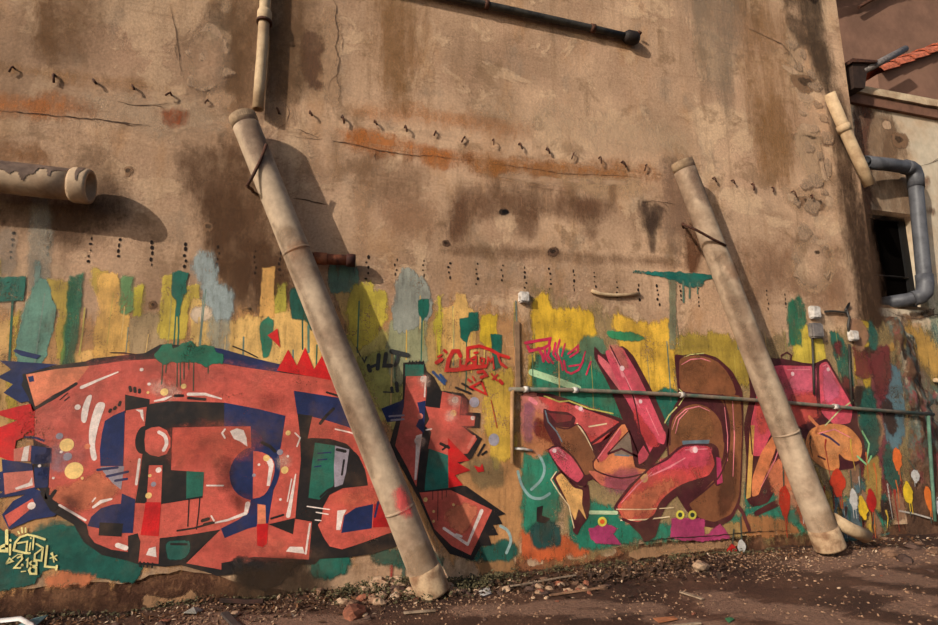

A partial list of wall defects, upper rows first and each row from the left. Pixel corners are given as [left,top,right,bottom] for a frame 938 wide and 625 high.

water stain [301,32,325,90]
crack [328,0,343,101]
water stain [784,0,831,93]
crack [0,101,167,127]
rust [163,109,188,126]
crack [275,100,469,161]
rust [346,129,628,180]
peeling [782,27,834,212]
water stain [180,139,295,307]
water stain [450,190,602,238]
water stain [830,115,885,338]